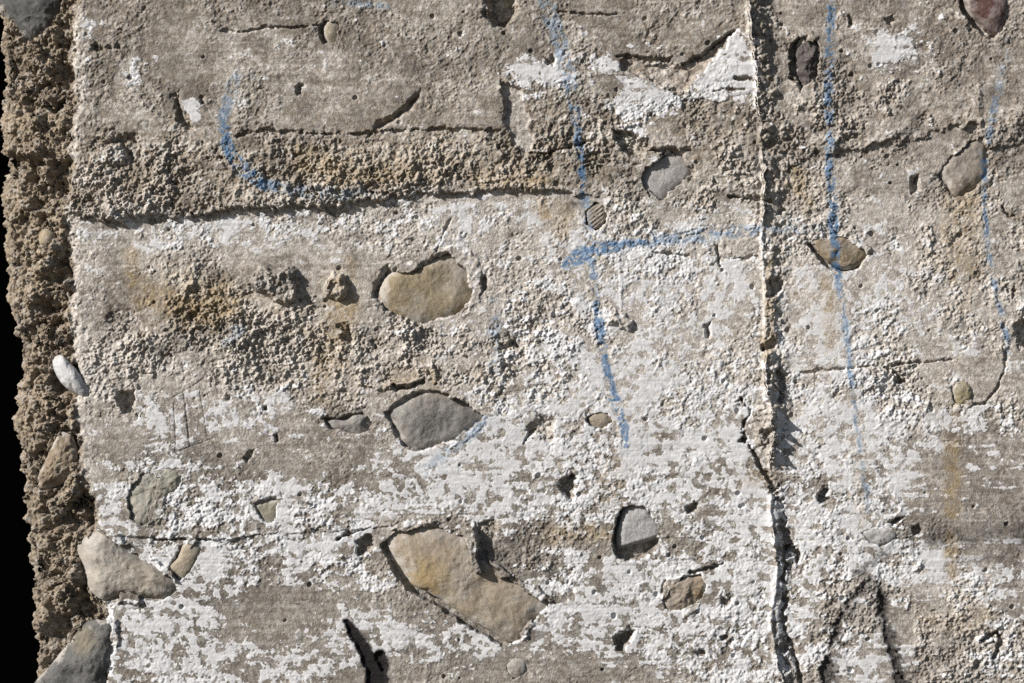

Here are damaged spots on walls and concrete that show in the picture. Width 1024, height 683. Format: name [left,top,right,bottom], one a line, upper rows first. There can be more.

spalling [0,0,578,683]
crack [974,353,1010,406]
peeling [566,420,773,683]
crack [735,396,805,683]